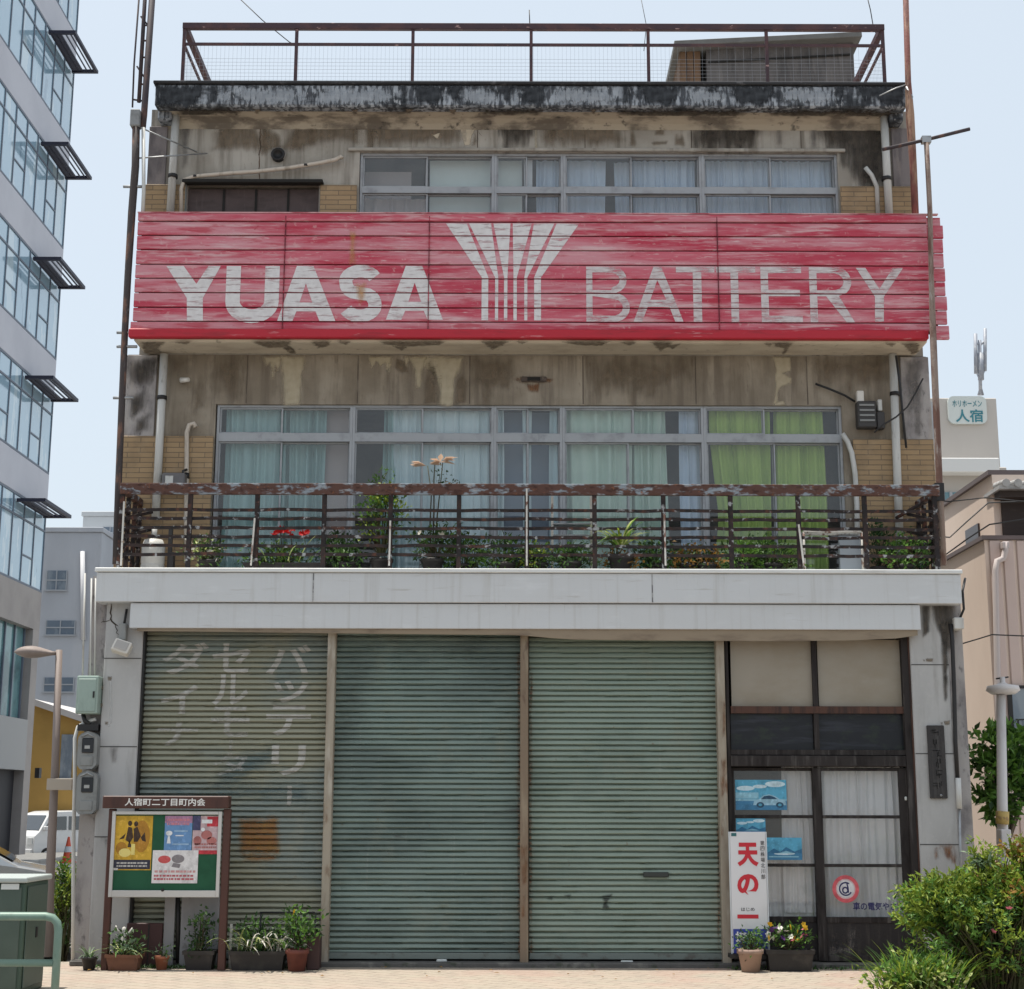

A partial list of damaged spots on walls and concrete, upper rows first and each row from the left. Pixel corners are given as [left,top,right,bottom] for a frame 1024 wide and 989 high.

leakage [401,84,462,106]
mould [483,85,544,116]
leakage [218,129,455,151]
leakage [130,359,158,430]
leakage [369,357,510,406]
leakage [923,606,954,698]